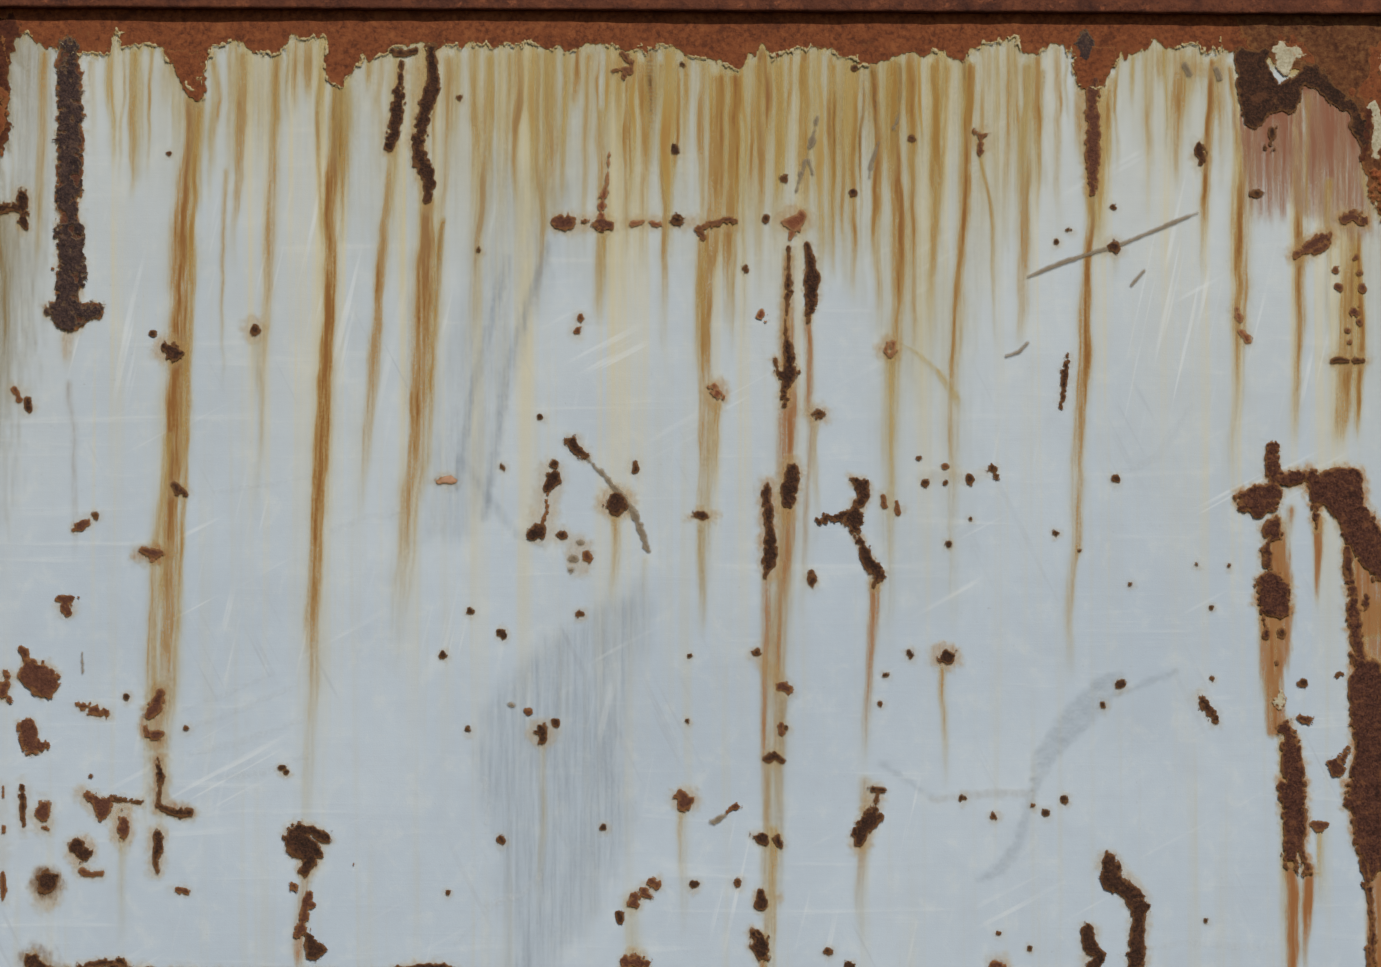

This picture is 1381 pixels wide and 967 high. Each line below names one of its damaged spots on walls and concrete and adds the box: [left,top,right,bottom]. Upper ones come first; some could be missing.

corrosion [0,8,1381,666]
corrosion [133,81,206,819]
corrosion [751,209,826,764]
corrosion [815,477,901,707]
corrosion [0,645,62,703]
corrosion [16,717,51,757]
corrosion [1233,440,1381,967]
corrosion [851,785,886,851]
corrosion [282,821,333,961]
corrosion [749,927,771,967]
corrosion [1080,922,1107,967]
corrosion [1099,850,1151,967]